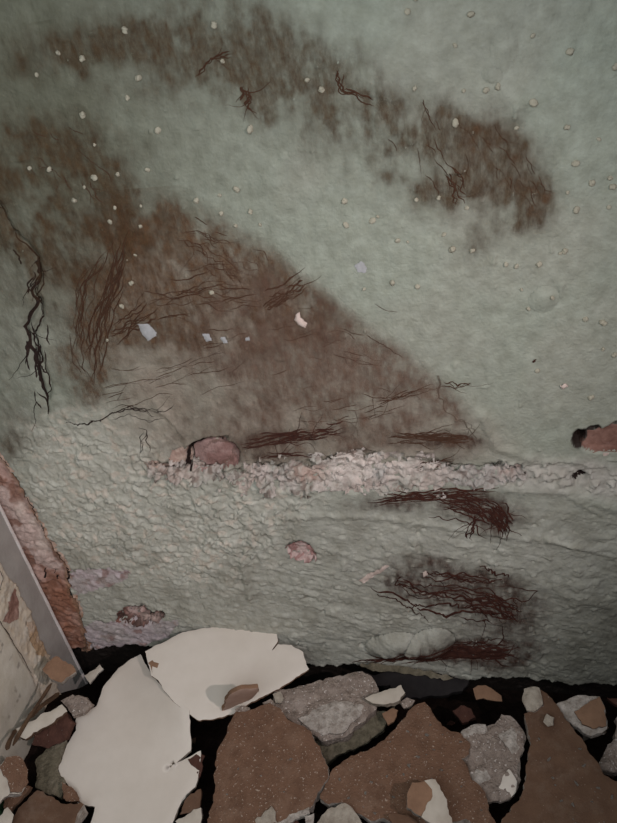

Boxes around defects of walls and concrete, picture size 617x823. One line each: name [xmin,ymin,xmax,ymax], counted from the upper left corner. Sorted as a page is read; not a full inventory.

crack [0,202,173,458]
peeling [138,324,157,341]
corrosion [377,381,486,406]
corrosion [241,413,344,463]
spalling [145,436,527,500]
corrosion [388,424,481,471]
flaking render [575,422,617,456]
corrosion [370,487,525,553]
peeling [0,453,179,657]
spalling [285,541,317,563]
corrosion [354,558,537,670]